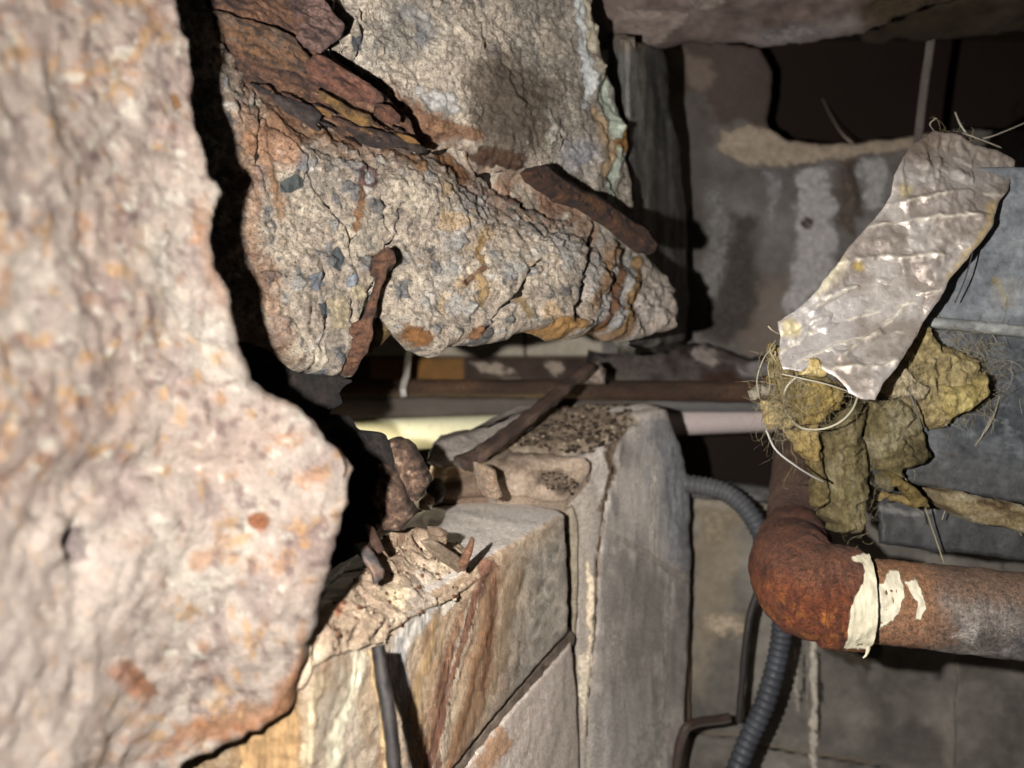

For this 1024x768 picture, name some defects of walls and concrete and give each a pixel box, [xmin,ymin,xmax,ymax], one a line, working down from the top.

peeling [612,0,725,46]
peeling [213,0,384,104]
rust [262,99,358,150]
spalling [280,174,303,193]
crack [419,140,505,189]
rust [385,91,659,341]
crack [586,227,594,247]
crack [483,258,542,332]
crack [574,282,585,318]
peeling [470,362,521,380]
rust [454,362,595,471]
rust [408,562,522,768]